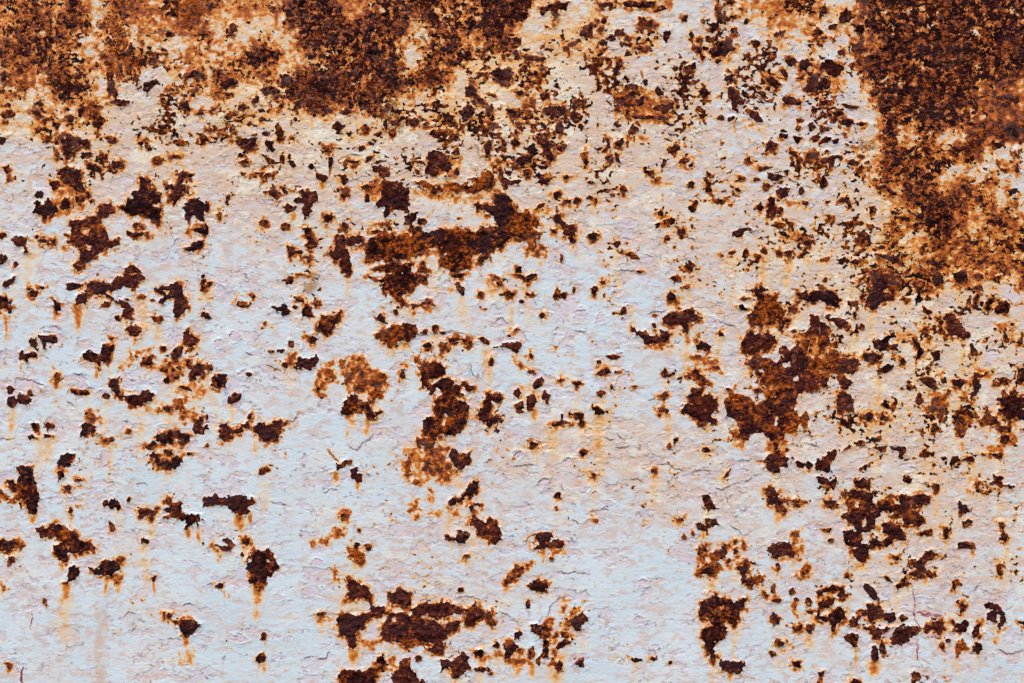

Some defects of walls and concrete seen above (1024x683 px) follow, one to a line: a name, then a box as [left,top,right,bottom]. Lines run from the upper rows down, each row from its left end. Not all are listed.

rust [220,288,268,315]
rust [257,319,276,333]
rust [330,490,400,565]
rust [961,511,979,528]
rust [0,576,11,603]
rust [205,580,231,602]
rust [973,543,1024,646]
rust [0,657,21,682]
rust [218,628,275,683]
rust [602,630,675,683]